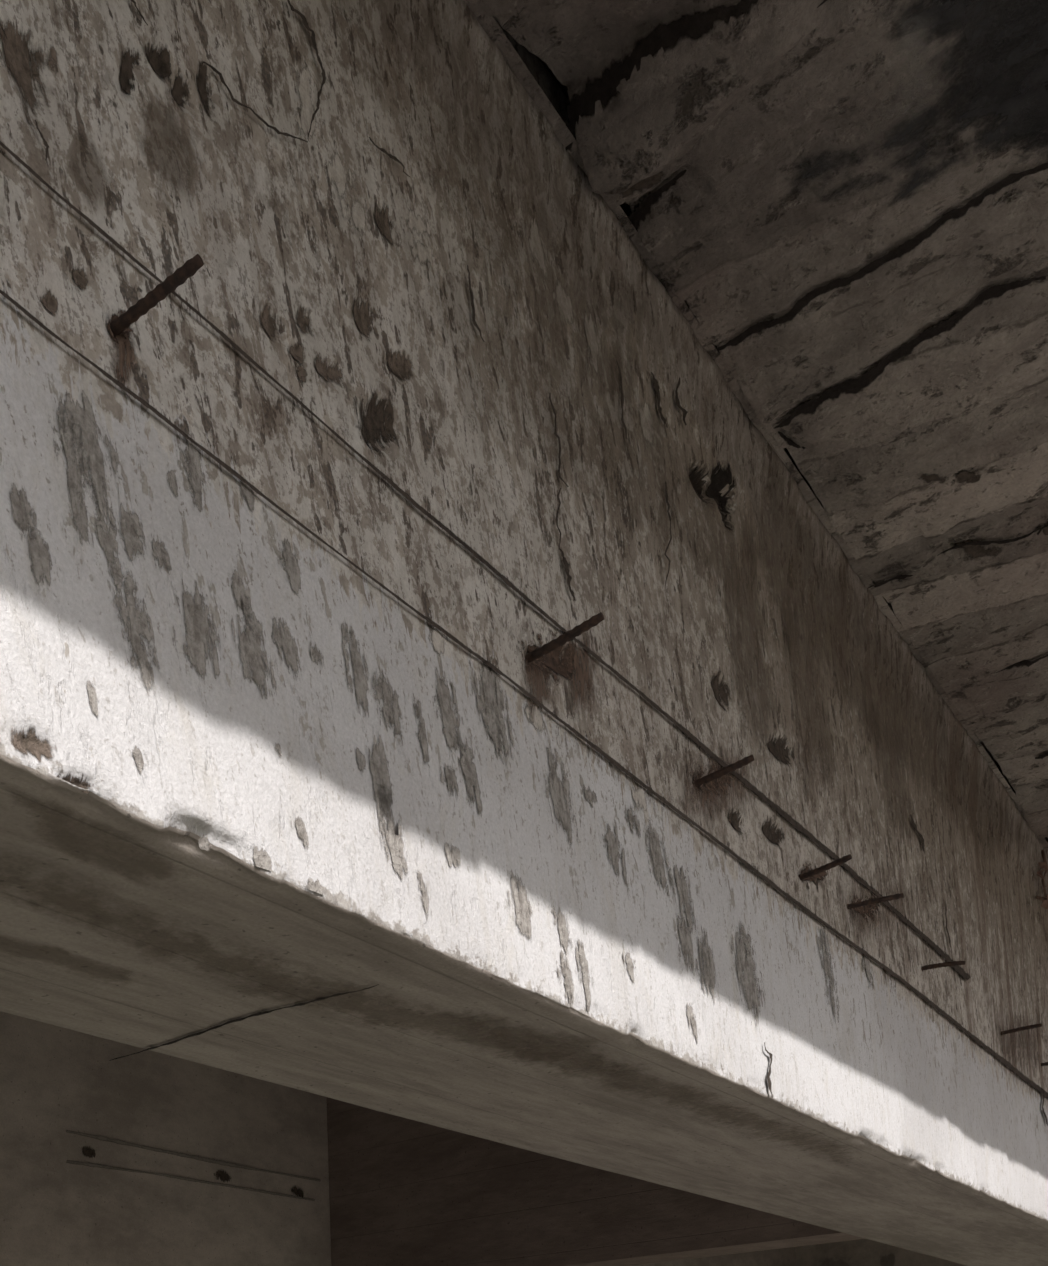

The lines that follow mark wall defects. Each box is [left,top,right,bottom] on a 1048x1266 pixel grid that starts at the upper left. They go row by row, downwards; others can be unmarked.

crack [203,0,326,143]
crack [565,0,758,151]
water stain [795,0,1048,206]
crack [714,163,1048,351]
corrosion [108,321,137,383]
crack [774,276,1046,449]
spalling [689,461,735,530]
crack [937,525,1048,556]
crack [868,575,913,588]
crack [996,654,1048,673]
crack [109,984,379,1061]